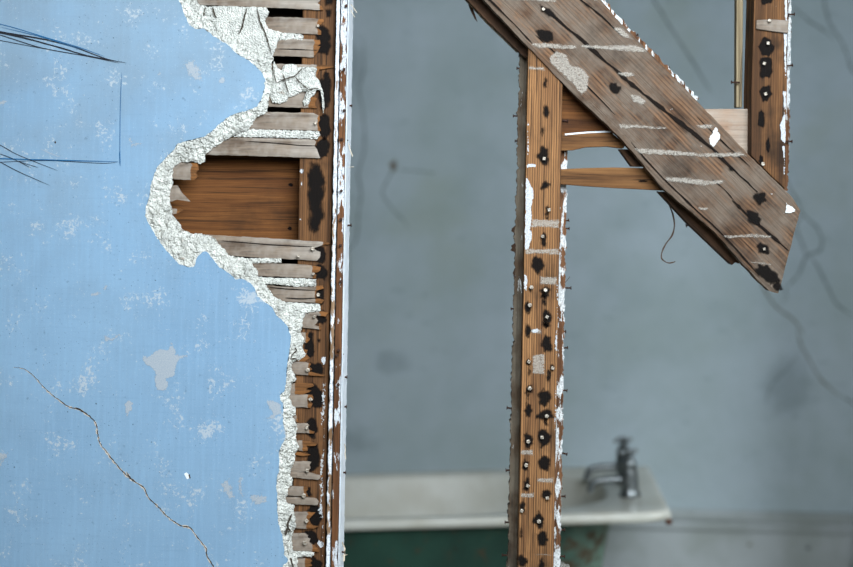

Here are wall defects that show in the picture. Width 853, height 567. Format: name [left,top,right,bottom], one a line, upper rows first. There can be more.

crack [489,0,611,110]
crack [581,0,622,36]
crack [554,17,789,251]
spalling [143,0,321,567]
crack [631,142,853,404]
crack [14,367,214,567]